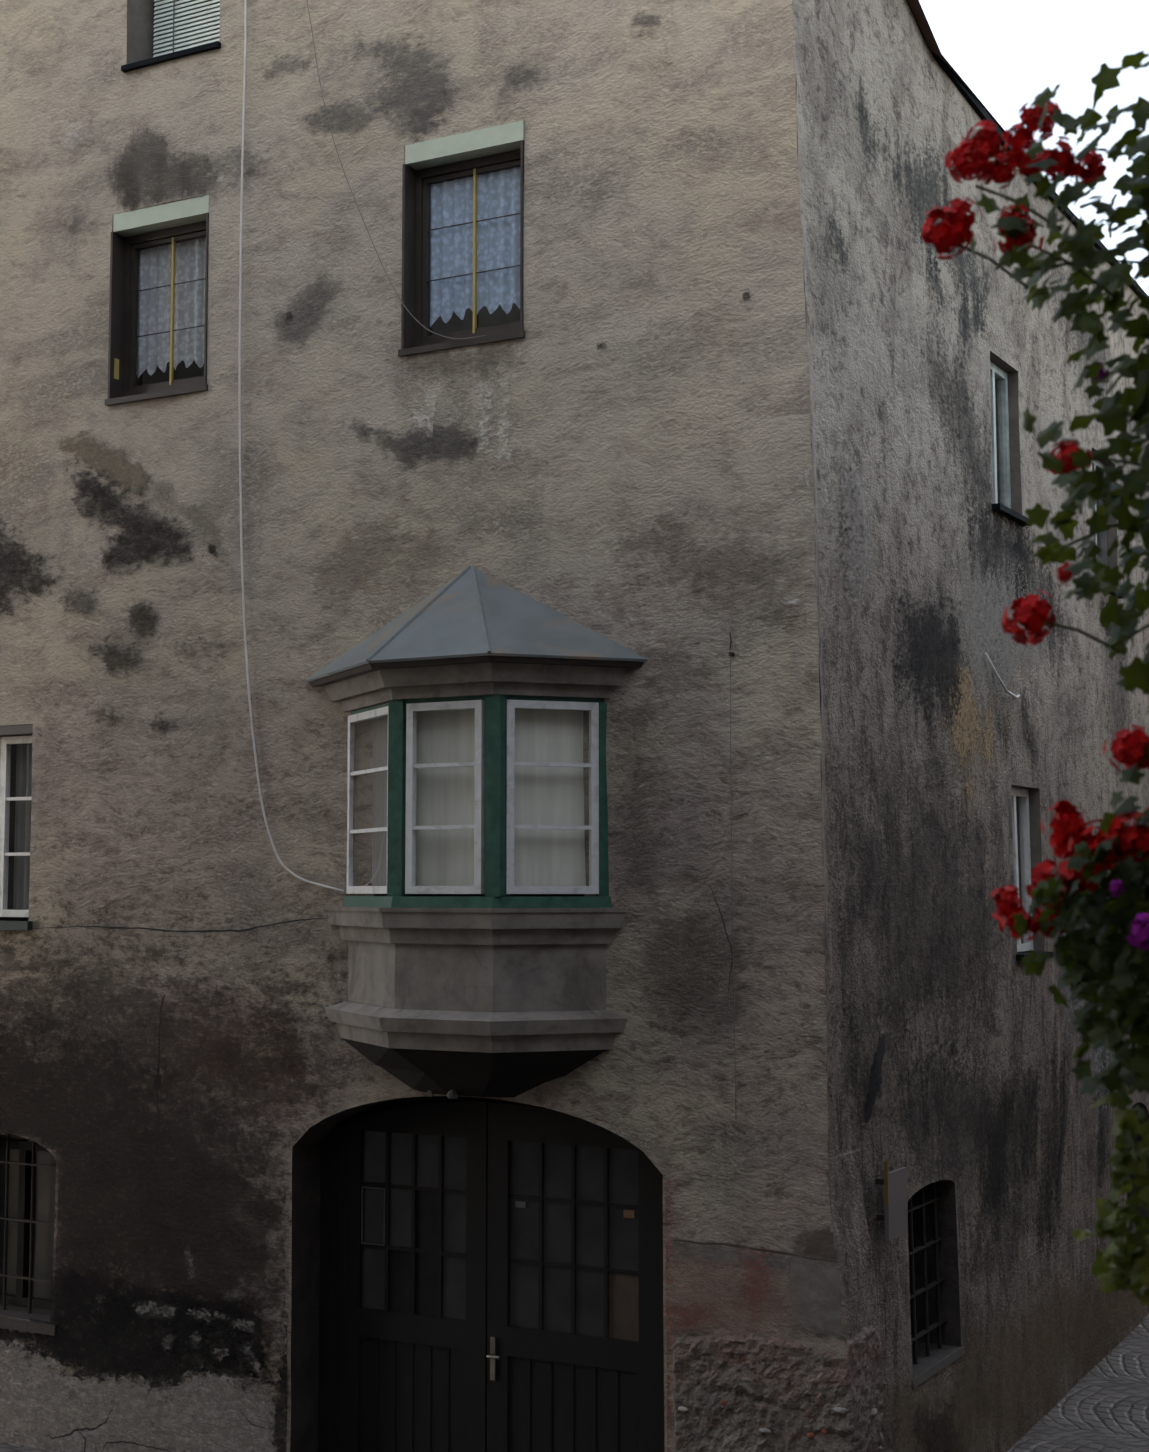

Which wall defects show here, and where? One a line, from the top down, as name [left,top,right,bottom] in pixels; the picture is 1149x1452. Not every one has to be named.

damp [306,42,457,134]
damp [108,129,213,210]
damp [353,375,513,470]
spalling [673,1326,887,1452]